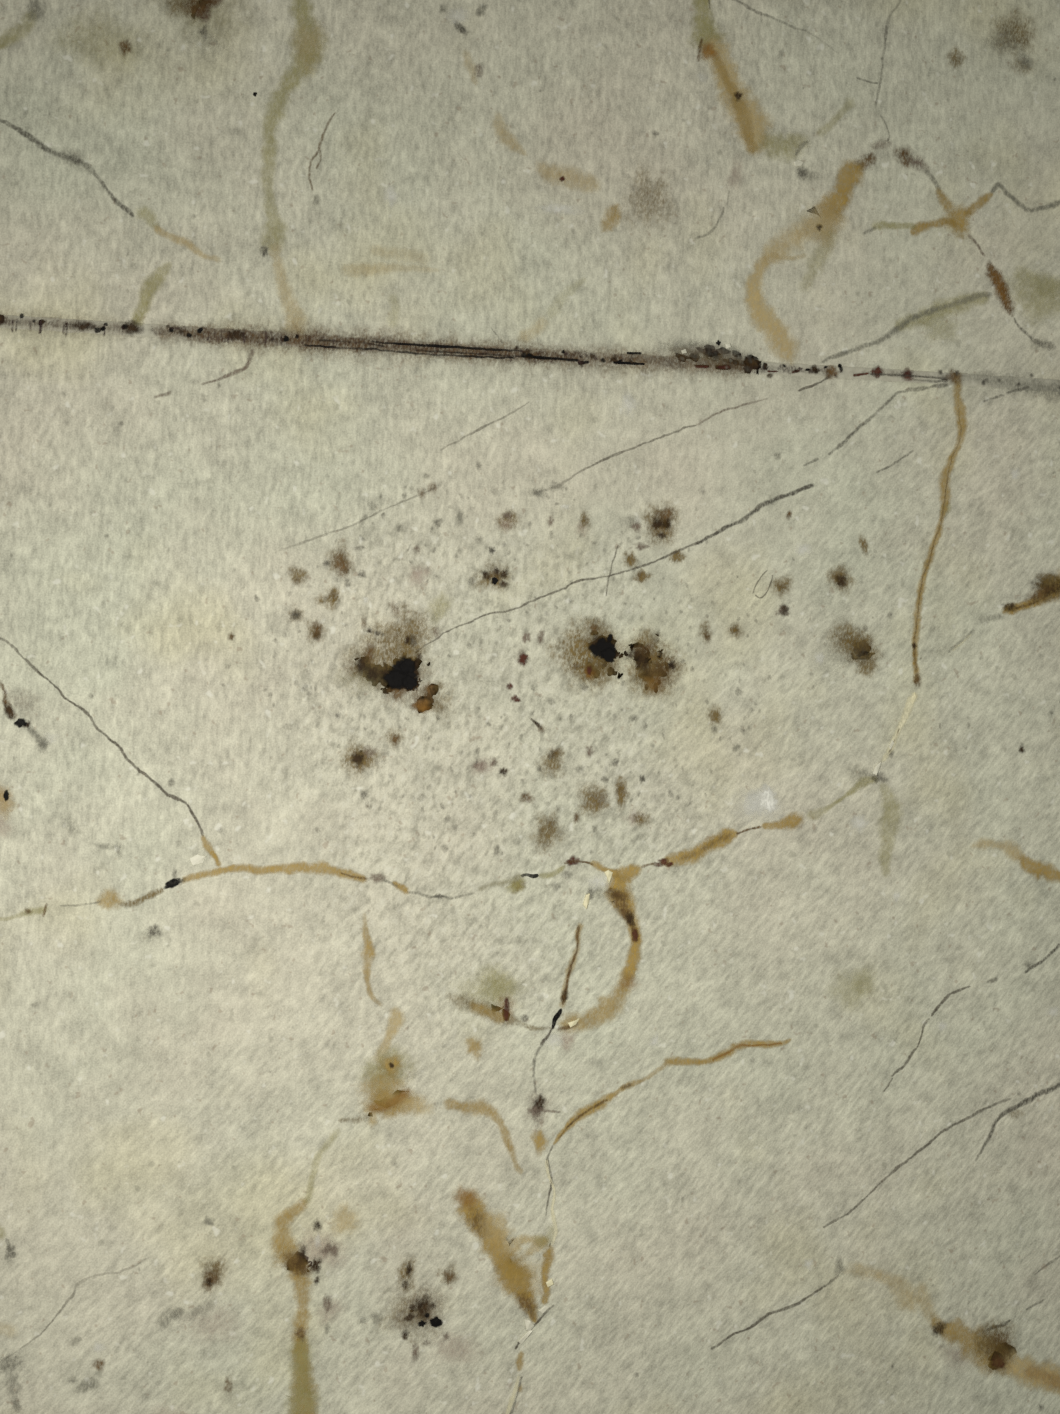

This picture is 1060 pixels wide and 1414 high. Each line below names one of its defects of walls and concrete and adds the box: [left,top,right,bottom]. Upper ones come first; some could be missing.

water stain [481,569,507,586]
water stain [626,508,672,582]
water stain [351,607,436,710]
water stain [519,632,544,665]
water stain [559,624,679,692]
crack [1,684,46,746]
crack [33,666,444,907]
crack [511,815,801,1044]
crack [870,1084,1060,1193]
crack [506,1096,557,1414]
water stain [402,1299,442,1356]
crack [711,1262,840,1349]